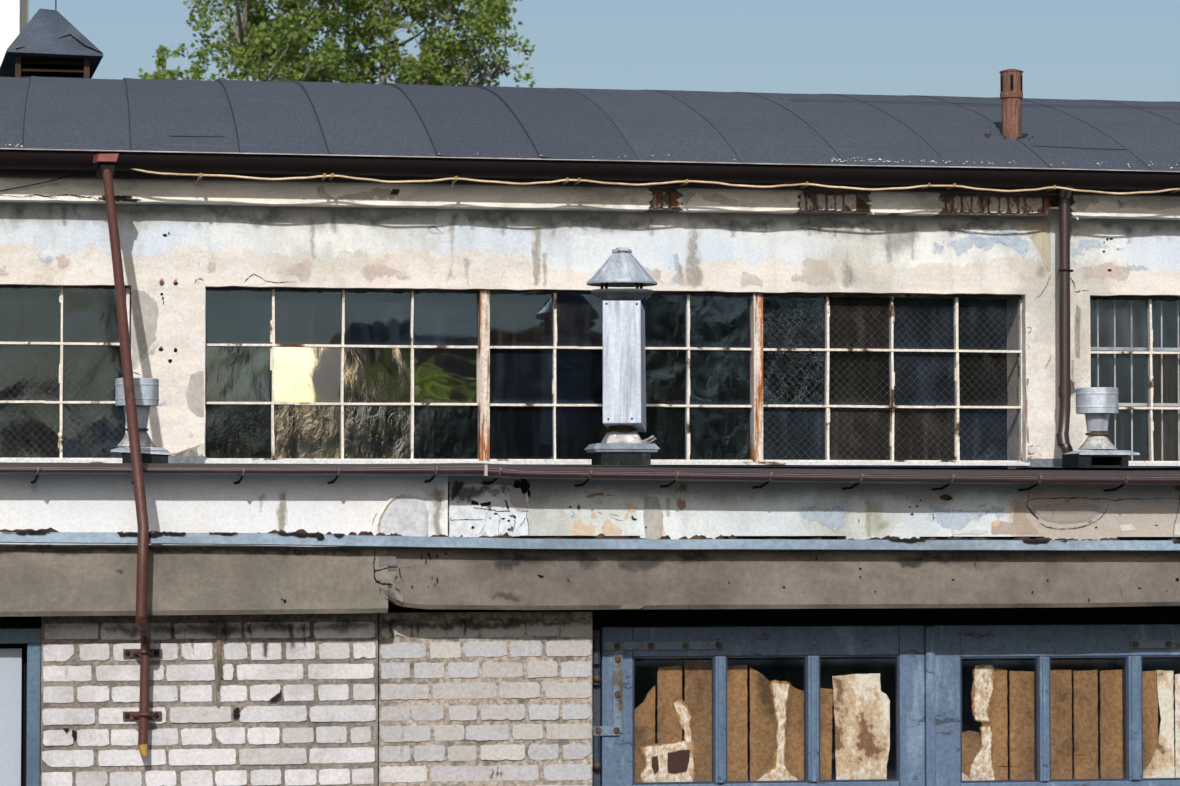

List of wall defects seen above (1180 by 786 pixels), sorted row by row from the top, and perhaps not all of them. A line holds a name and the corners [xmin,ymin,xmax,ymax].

flaking render [799,193,856,212]
flaking render [938,196,1050,215]
leakage [589,217,638,229]
leakage [801,219,864,231]
leakage [941,219,992,232]
leakage [532,219,554,283]
peeling [950,229,1028,254]
peeling [448,479,531,537]
peeling [569,501,647,536]
crack [1026,493,1180,540]
corrosion [277,532,344,540]
crack [373,513,415,603]